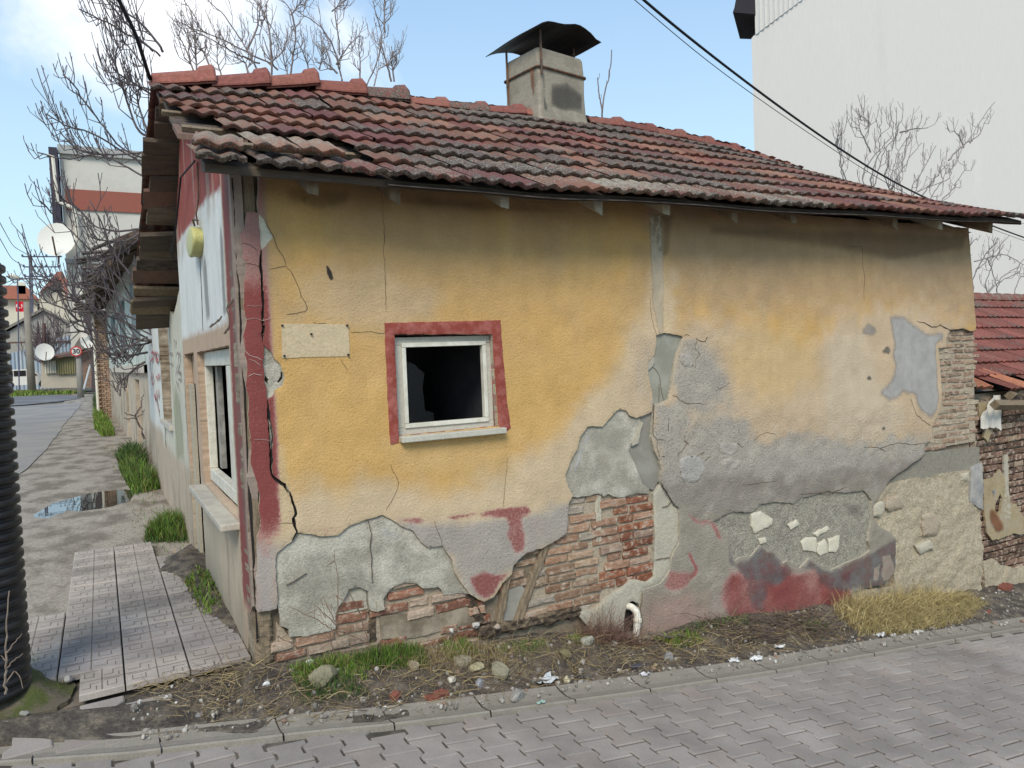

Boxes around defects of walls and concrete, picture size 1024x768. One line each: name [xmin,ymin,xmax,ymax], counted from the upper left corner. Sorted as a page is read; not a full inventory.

crack [200,178,326,643]
spalling [263,347,284,399]
spalling [275,515,468,637]
spalling [565,333,681,632]
spalling [713,491,870,569]
peeling [882,317,943,416]
peeling [888,401,1024,540]